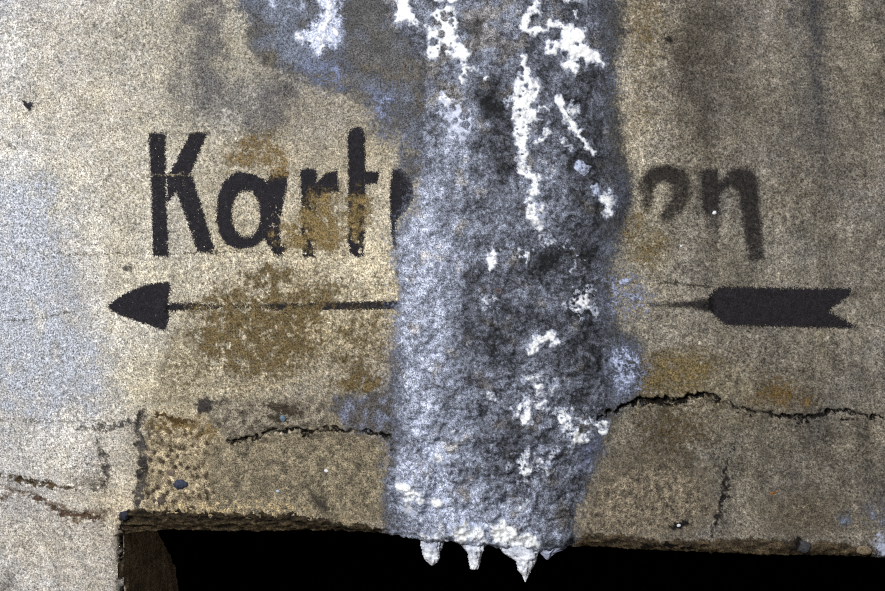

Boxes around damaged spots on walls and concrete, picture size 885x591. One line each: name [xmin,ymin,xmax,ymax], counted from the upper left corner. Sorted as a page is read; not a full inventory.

corrosion [225,133,289,177]
corrosion [268,192,373,256]
water stain [179,0,654,582]
corrosion [179,262,394,393]
crack [227,425,395,451]
crack [600,391,884,424]
crack [640,443,735,550]
water stain [863,497,885,557]